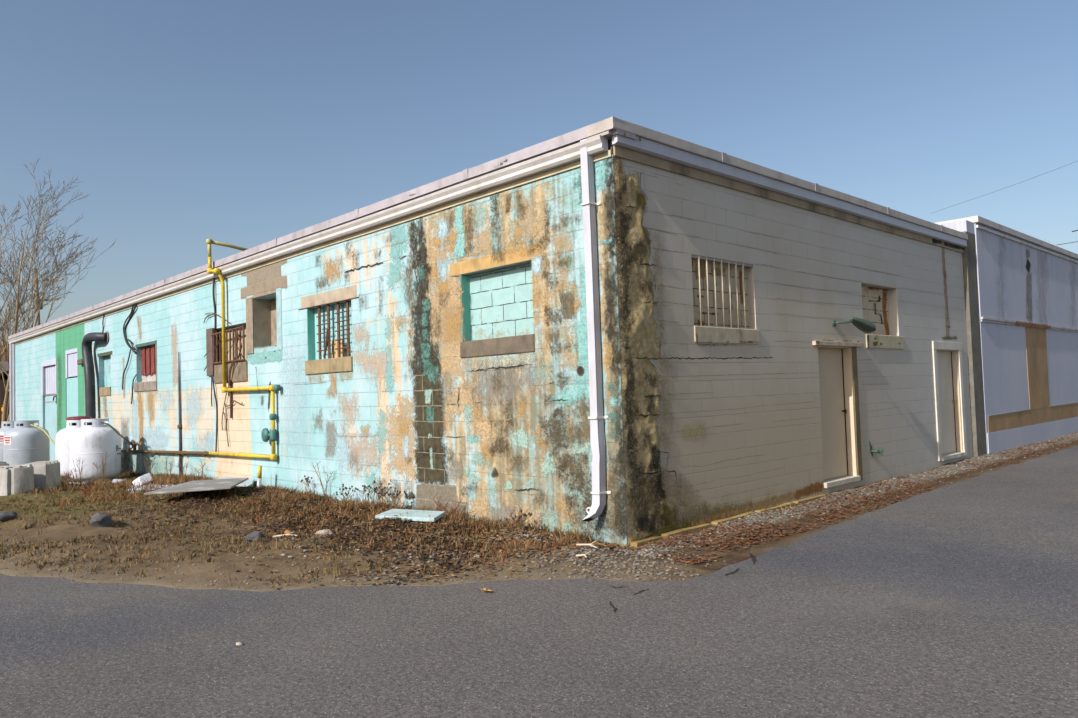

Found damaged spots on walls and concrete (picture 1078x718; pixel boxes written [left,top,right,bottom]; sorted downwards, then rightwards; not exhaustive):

peeling [129,398,174,476]
peeling [339,315,418,485]
peeling [387,224,409,289]
leakage [374,217,477,518]
leakage [464,193,525,260]
peeling [427,183,591,532]
leakage [466,204,579,477]
leakage [540,157,631,539]
flaking render [573,157,679,547]